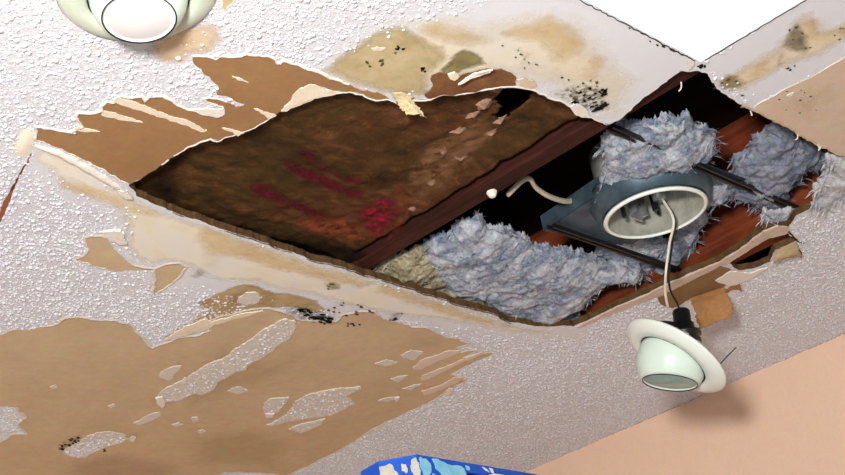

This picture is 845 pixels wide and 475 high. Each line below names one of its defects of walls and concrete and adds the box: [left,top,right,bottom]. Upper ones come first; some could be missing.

peeling [32,51,389,200]
water stain [330,20,624,112]
peeling [424,68,537,99]
peeling [570,103,592,118]
water stain [720,20,845,96]
peeling [753,56,845,155]
peeling [74,229,190,295]
water stain [165,285,374,341]
water stain [294,242,363,263]
water stain [361,200,396,235]
spalling [575,225,789,328]
peeling [0,307,492,475]